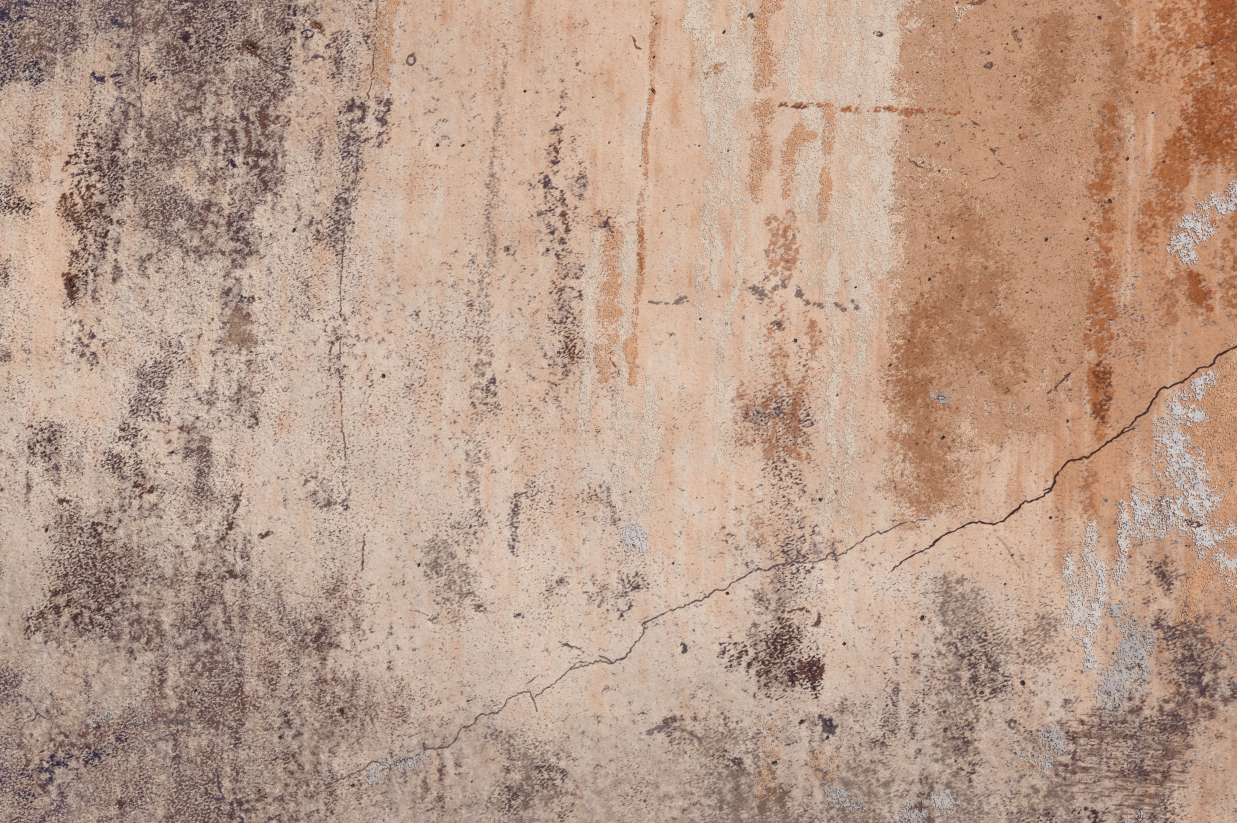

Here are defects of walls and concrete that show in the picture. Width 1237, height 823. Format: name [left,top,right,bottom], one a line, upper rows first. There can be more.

leakage [55,111,136,309]
leakage [309,96,394,259]
corrosion [1083,104,1119,443]
corrosion [1136,0,1237,626]
leakage [22,418,68,459]
leakage [23,511,130,641]
leakage [95,335,185,499]
crack [320,345,1237,792]
corrosion [1080,455,1098,529]
leakage [1060,370,1237,713]
leakage [717,617,825,700]
leakage [953,623,1010,701]